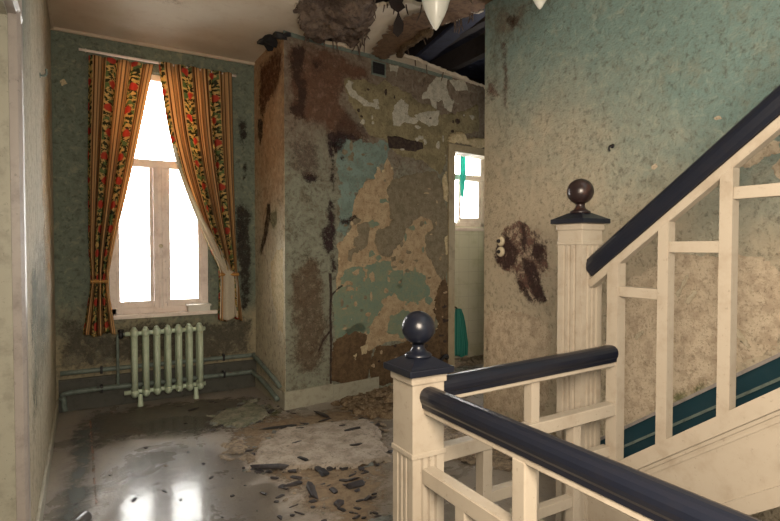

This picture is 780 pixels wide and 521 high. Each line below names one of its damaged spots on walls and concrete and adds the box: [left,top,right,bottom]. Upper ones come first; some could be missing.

damp [288,44,366,186]
damp [322,201,358,280]
flaking render [336,77,485,360]
damp [291,257,327,372]